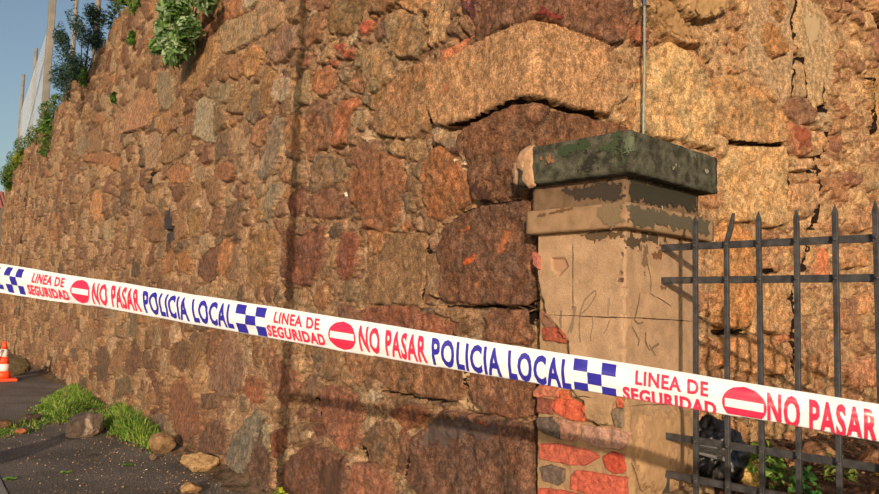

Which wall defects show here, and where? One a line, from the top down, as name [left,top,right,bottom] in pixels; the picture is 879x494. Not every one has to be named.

crack [790,0,825,103]
crack [429,97,599,148]
spalling [521,280,569,354]
spalling [537,397,636,494]